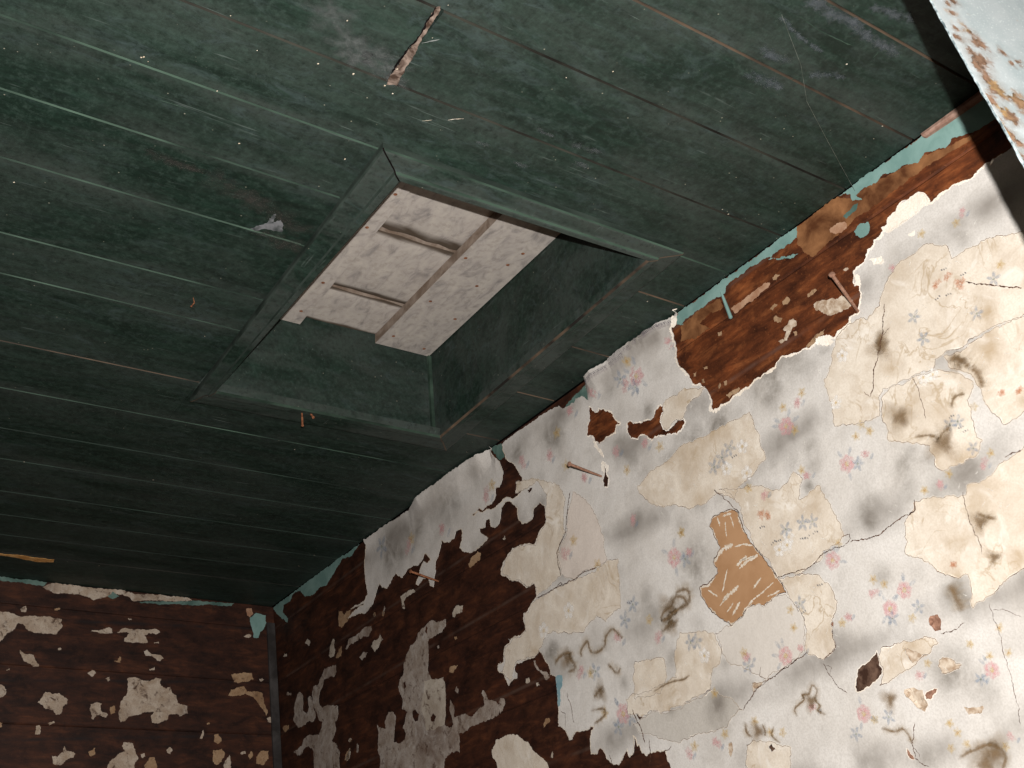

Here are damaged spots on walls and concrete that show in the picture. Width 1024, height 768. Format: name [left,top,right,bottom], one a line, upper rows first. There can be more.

peeling [669,99,1012,413]
peeling [566,386,686,488]
crack [537,493,597,598]
crack [778,500,916,577]
peeling [0,444,671,768]
crack [743,631,847,710]